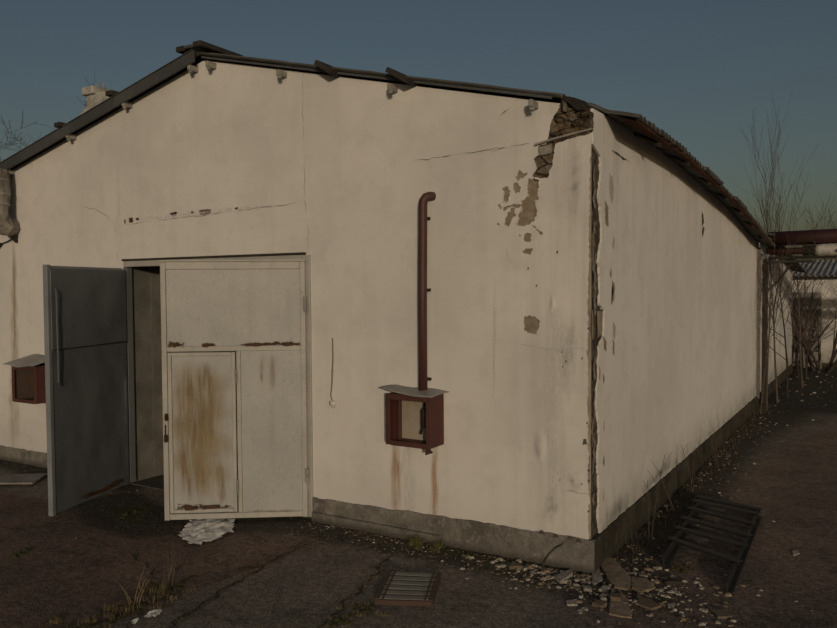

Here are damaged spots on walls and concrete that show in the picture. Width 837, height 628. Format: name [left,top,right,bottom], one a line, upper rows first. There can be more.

crack [414,143,529,161]
spalling [124,202,297,225]
spalling [497,99,616,543]